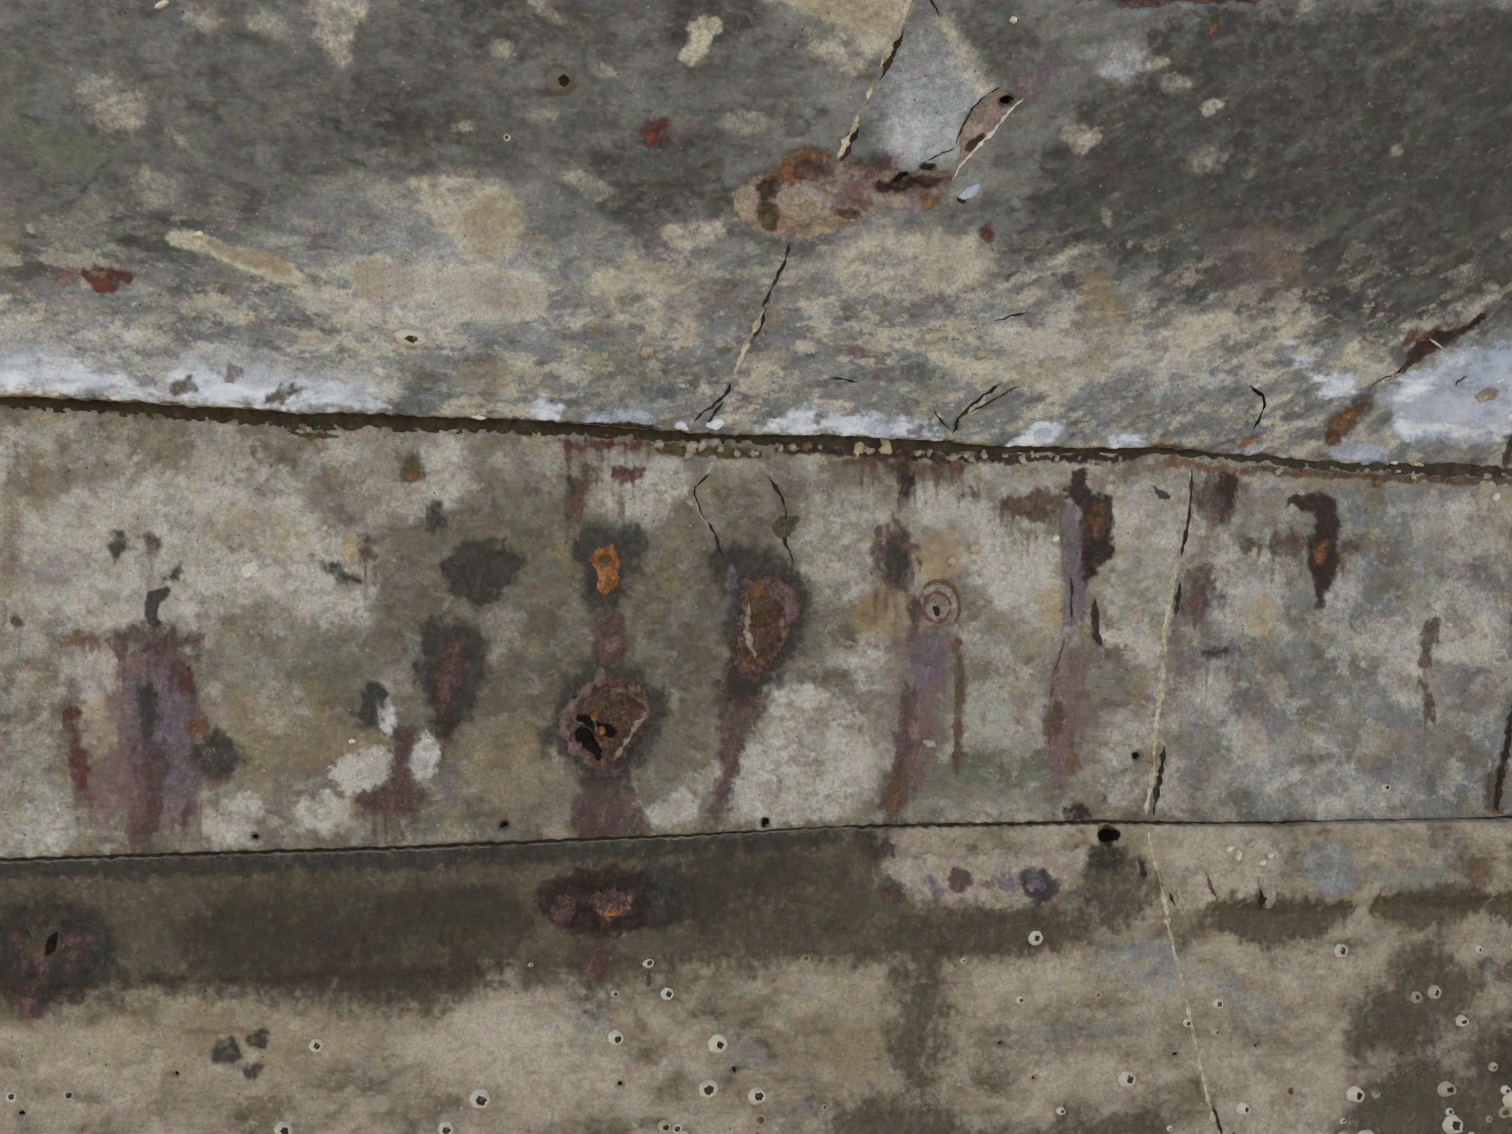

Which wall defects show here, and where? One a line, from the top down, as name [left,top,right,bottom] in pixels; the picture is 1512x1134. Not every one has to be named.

crack [837,0,940,162]
spalling [732,87,1024,244]
crack [694,242,790,422]
efflorescence [1331,340,1512,467]
rust [589,544,621,595]
rust [994,468,1116,785]
rust [1241,492,1358,608]
damp [0,537,1168,1134]
crack [1137,465,1222,1134]
crack [1484,706,1512,816]